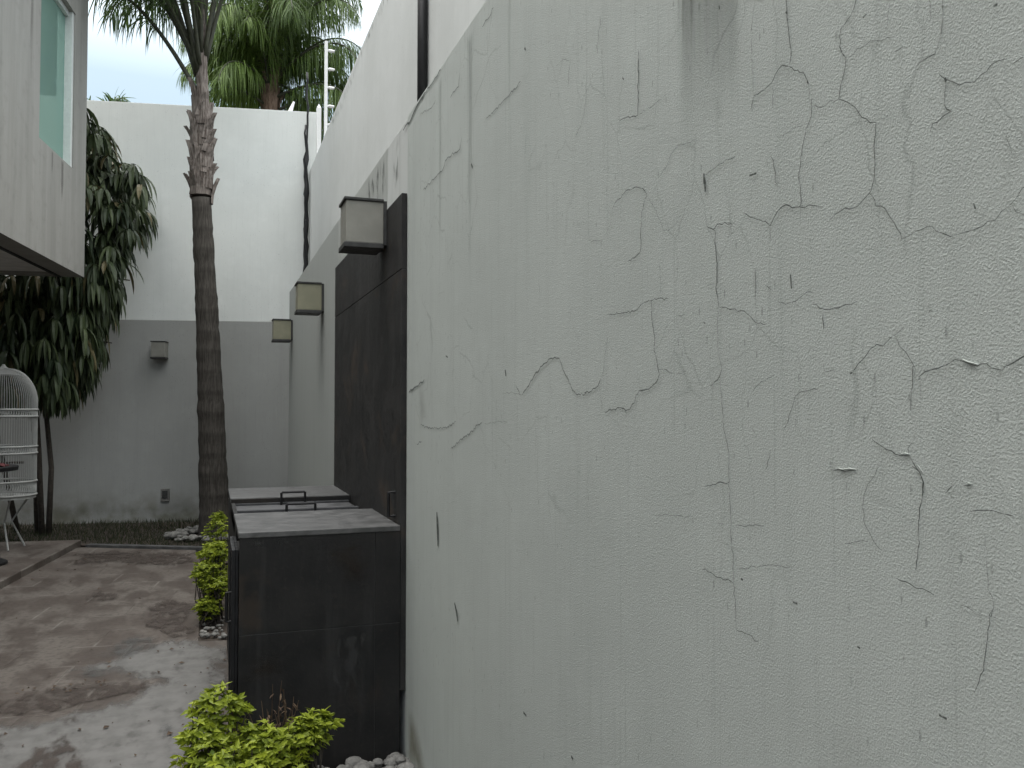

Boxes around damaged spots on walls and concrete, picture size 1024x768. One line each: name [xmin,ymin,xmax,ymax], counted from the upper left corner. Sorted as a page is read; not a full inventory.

crack [403,70,460,130]
crack [620,51,658,121]
crack [589,140,693,261]
crack [516,298,685,412]
crack [703,1,1024,642]
crack [417,421,496,448]
crack [965,574,994,692]